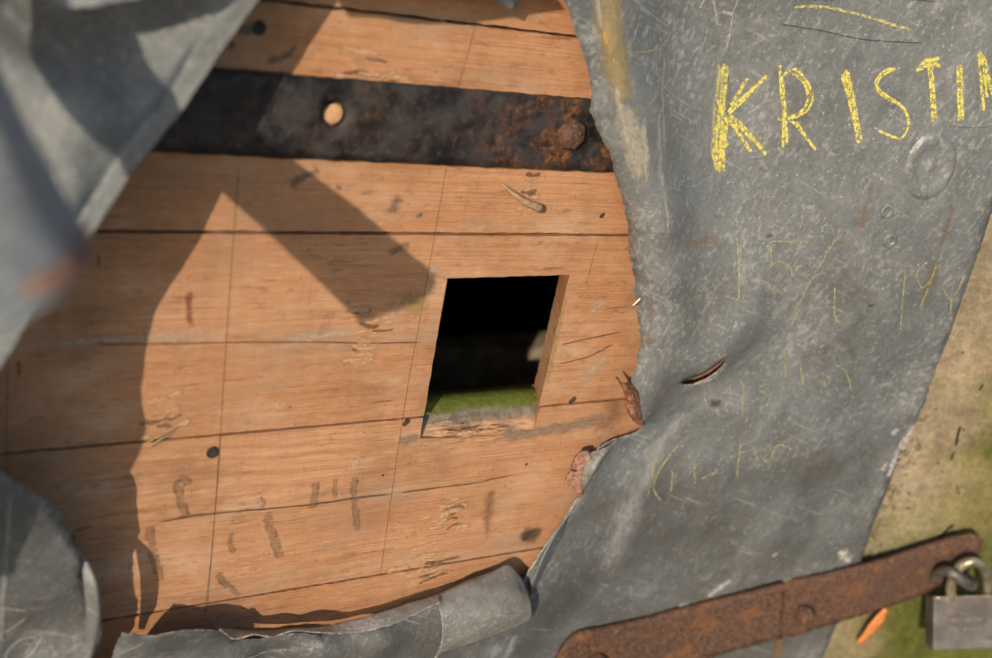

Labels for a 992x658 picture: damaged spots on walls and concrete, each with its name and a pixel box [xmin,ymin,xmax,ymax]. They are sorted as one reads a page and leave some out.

peeling [334,46,409,82]
peeling [347,307,393,332]
peeling [138,414,190,441]
efflorescence [880,426,914,476]
peeling [439,503,470,529]
peeling [388,557,459,584]